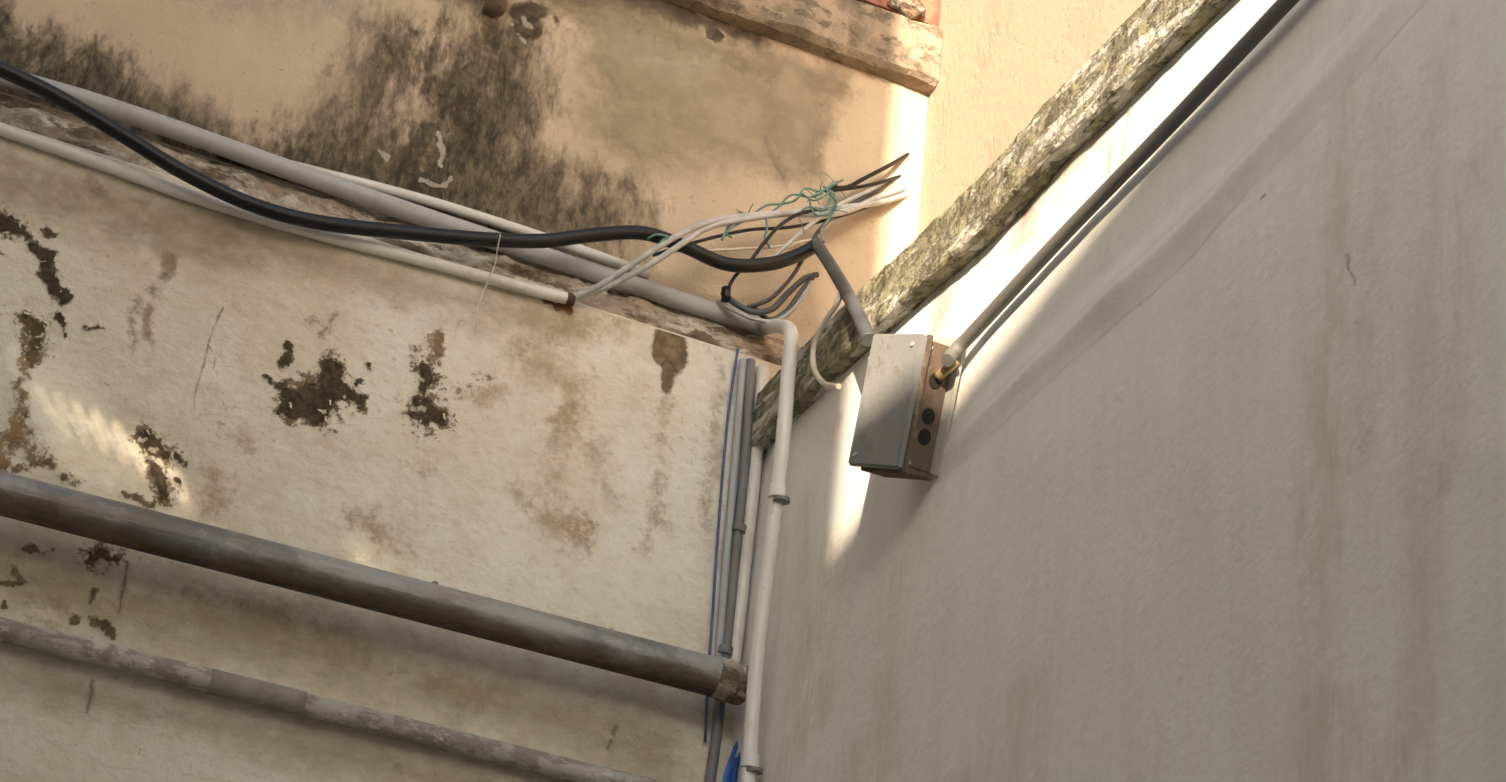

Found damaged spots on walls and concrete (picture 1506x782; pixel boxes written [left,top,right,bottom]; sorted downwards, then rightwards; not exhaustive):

water stain [0,7,657,257]
water stain [557,0,848,172]
spalling [0,206,74,337]
spalling [262,339,372,436]
spalling [402,329,458,442]
spalling [121,424,188,508]
spalling [70,541,127,640]